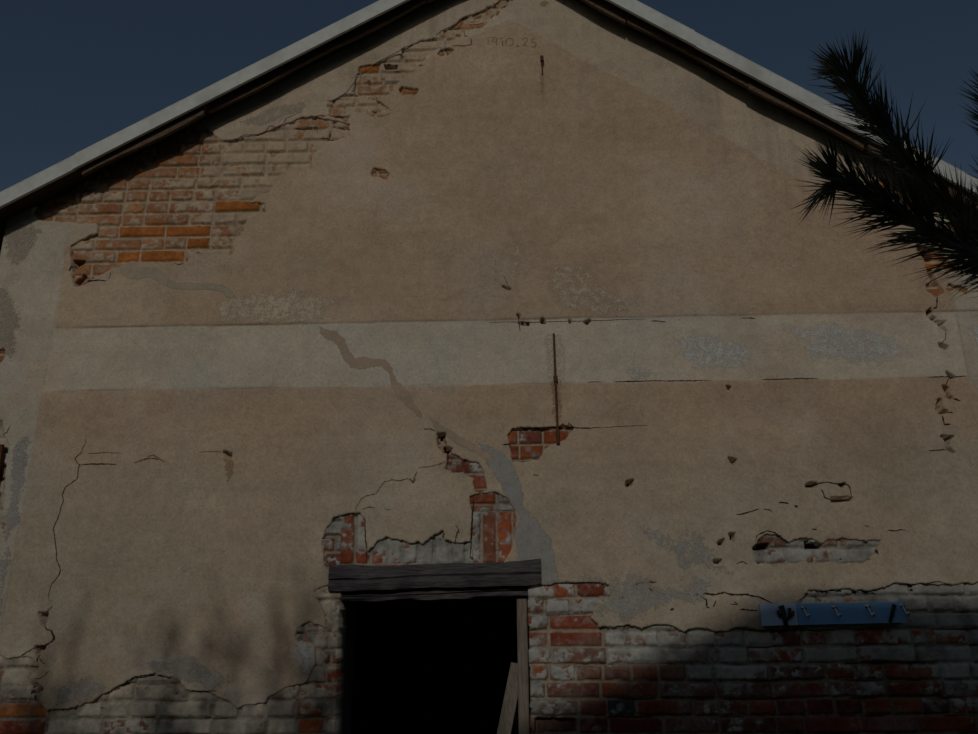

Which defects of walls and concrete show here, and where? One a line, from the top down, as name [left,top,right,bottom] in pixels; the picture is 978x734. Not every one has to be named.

flaking render [34,55,419,286]
flaking render [916,250,957,273]
flaking render [0,420,9,530]
crack [21,439,166,701]
flaking render [322,436,516,570]
crack [319,326,646,561]
flaking render [508,425,574,462]
flaking render [752,535,880,566]
flaking render [0,586,347,734]
flaking render [527,582,978,734]